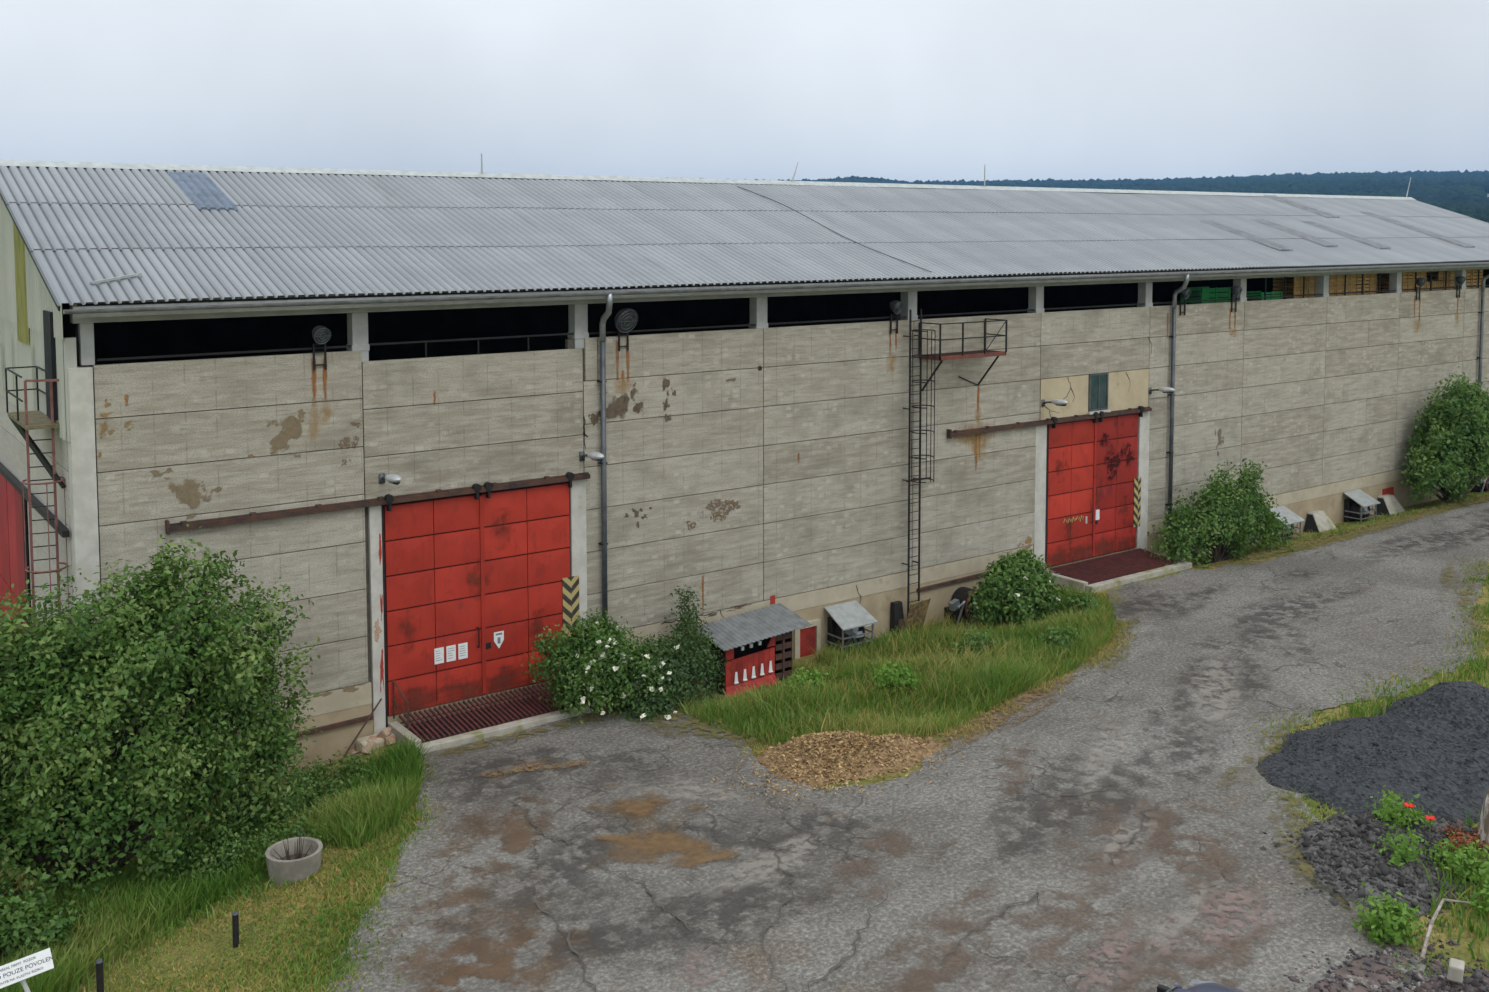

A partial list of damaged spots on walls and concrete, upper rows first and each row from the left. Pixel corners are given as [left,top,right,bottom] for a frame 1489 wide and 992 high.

rust [312,361,327,401]
rust [616,342,629,380]
peeling [248,409,305,459]
peeling [150,468,222,520]
spalling [686,499,740,530]